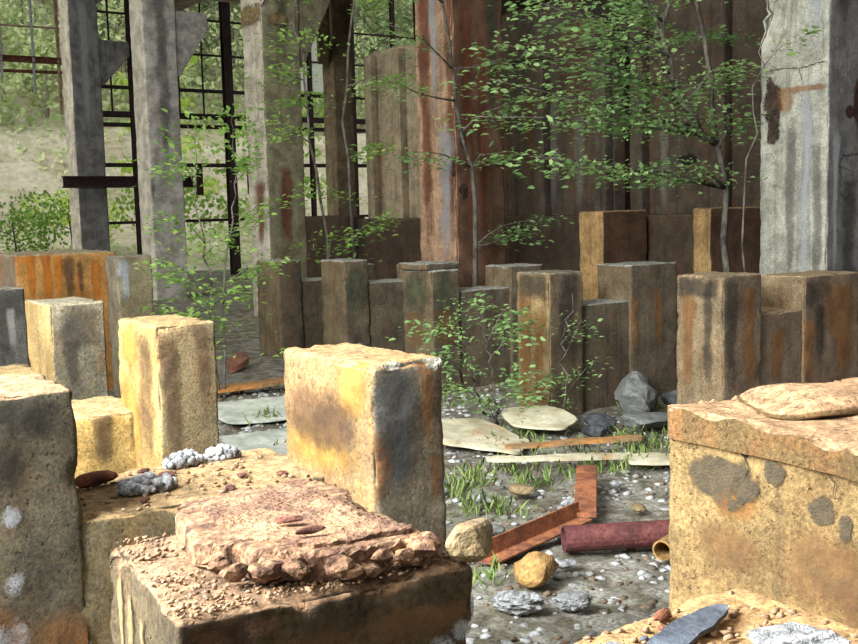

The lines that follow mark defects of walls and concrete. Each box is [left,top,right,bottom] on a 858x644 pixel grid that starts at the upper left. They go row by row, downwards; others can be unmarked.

corrosion [418,0,431,205]
corrosion [445,0,486,223]
damp [832,133,853,272]
corrosion [27,255,62,299]
damp [378,378,415,479]
damp [3,508,22,528]
damp [0,623,29,644]
damp [7,574,24,596]